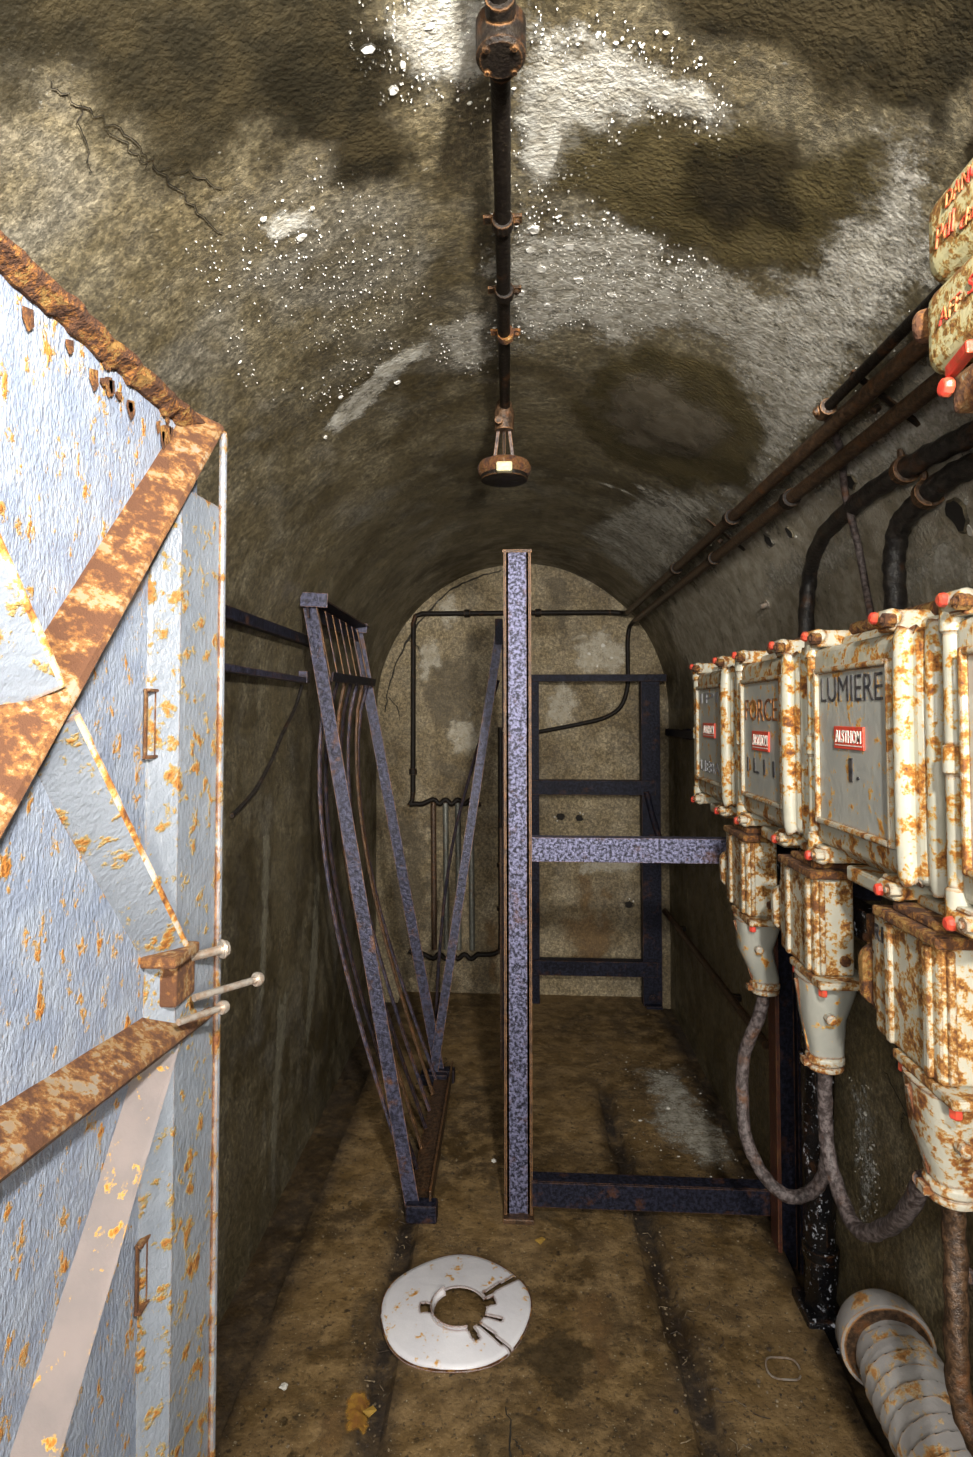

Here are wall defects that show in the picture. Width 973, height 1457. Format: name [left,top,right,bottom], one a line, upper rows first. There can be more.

damp [0,0,973,673]